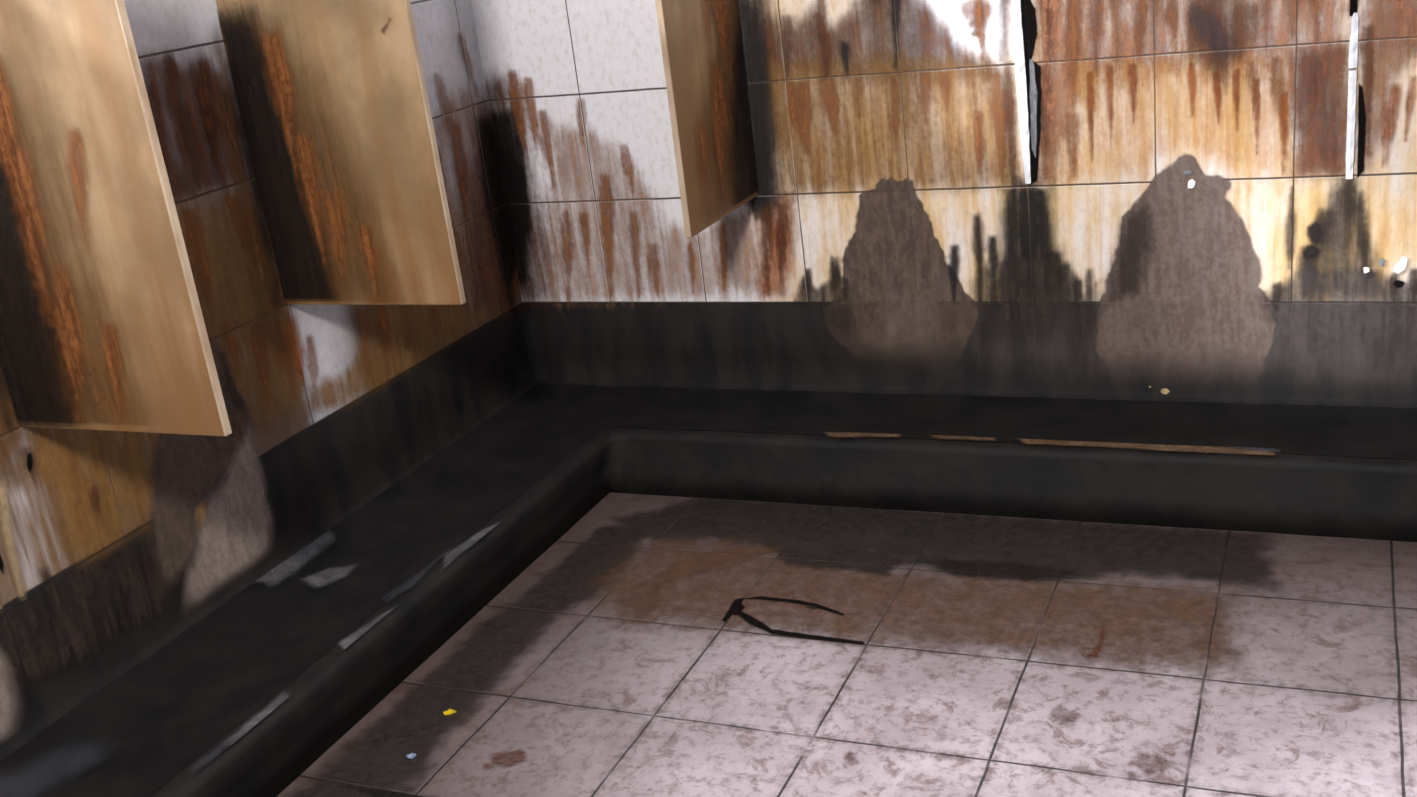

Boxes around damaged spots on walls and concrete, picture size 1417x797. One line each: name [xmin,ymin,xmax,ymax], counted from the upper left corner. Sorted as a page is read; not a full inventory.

corrosion [1040,0,1349,178]
corrosion [1363,0,1417,157]
leakage [803,269,811,296]
leakage [823,154,1281,365]